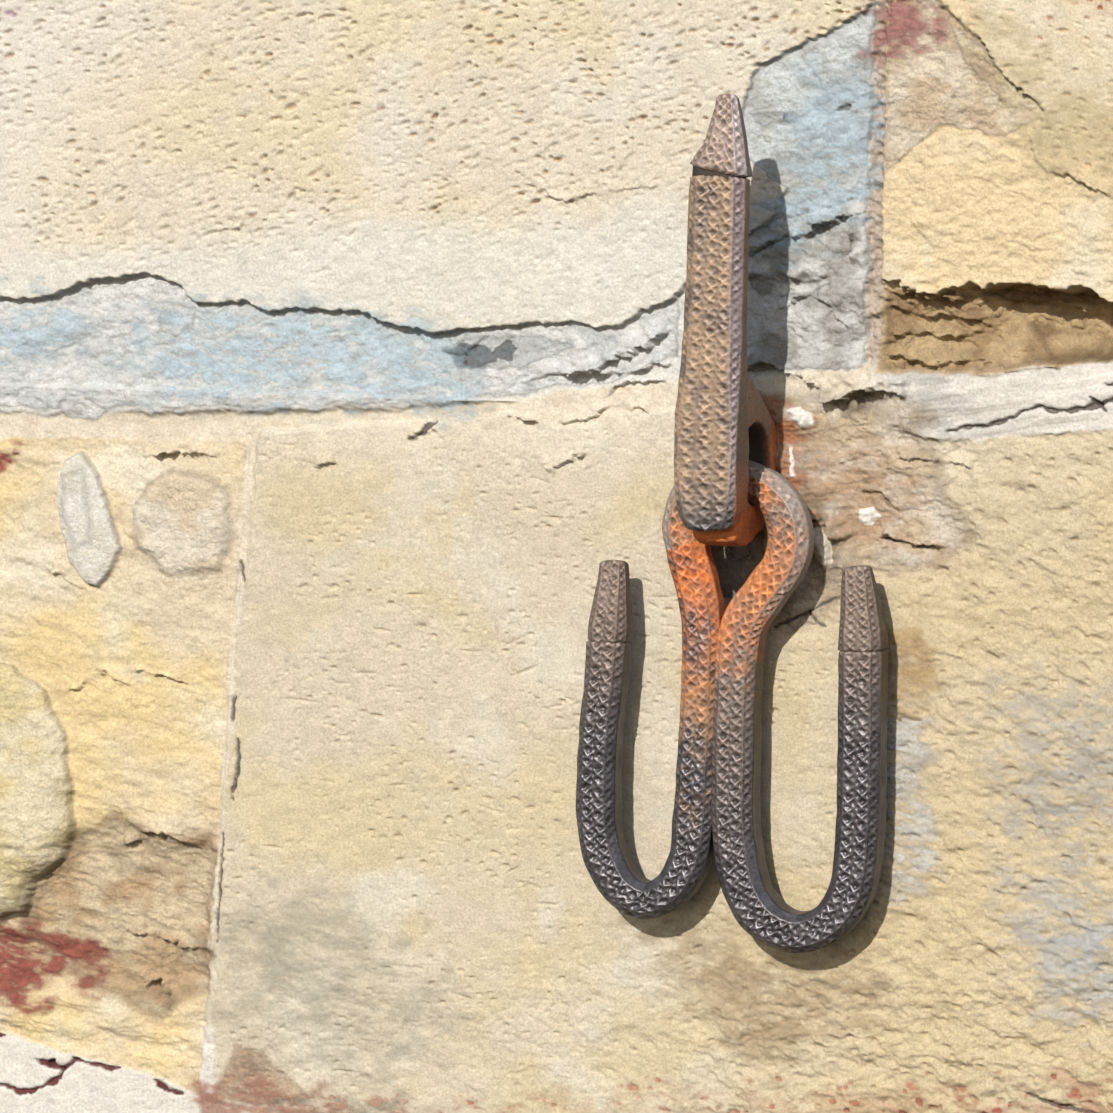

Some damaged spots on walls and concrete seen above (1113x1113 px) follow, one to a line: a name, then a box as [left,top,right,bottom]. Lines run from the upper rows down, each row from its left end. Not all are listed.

spalling [742,0,1043,371]
spalling [0,273,679,419]
spalling [883,288,1113,370]
rust [760,395,799,489]
crack [948,384,1113,431]